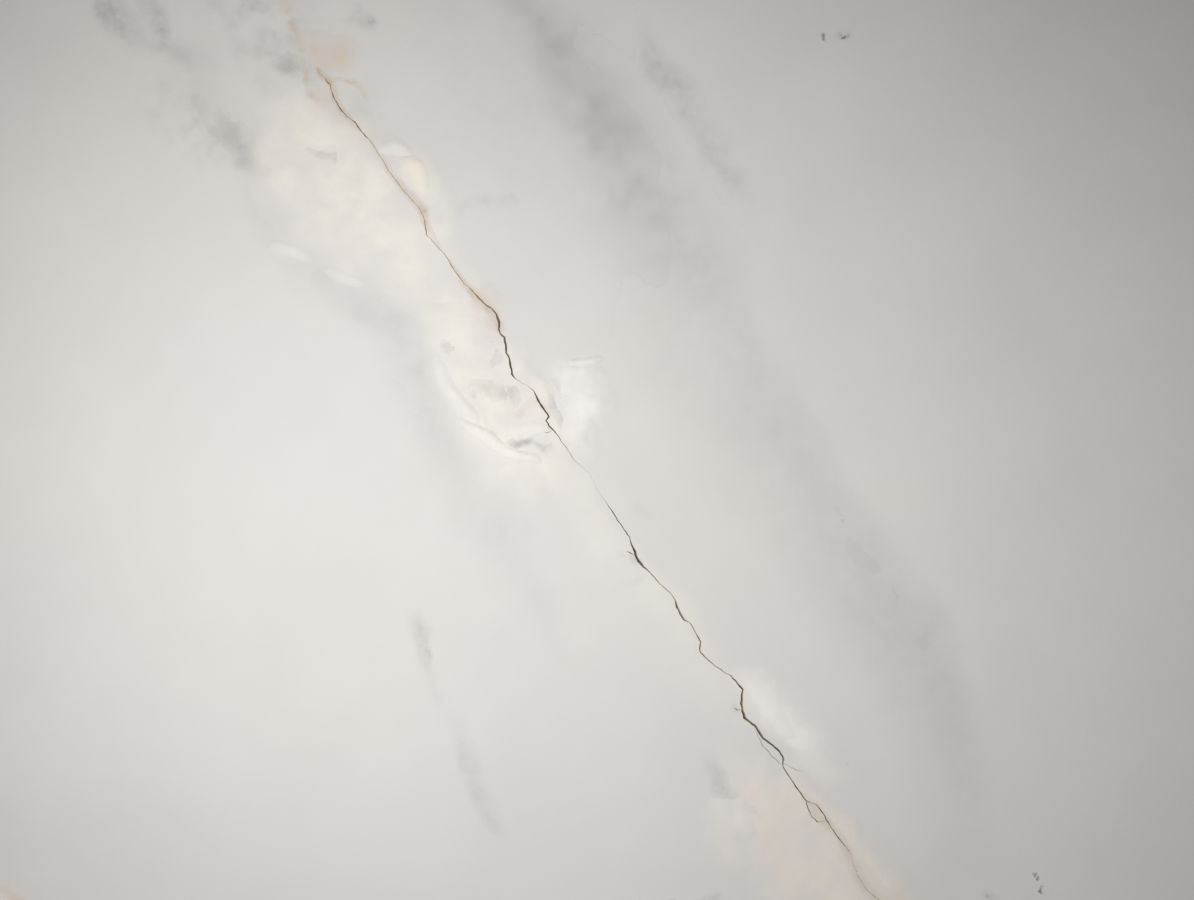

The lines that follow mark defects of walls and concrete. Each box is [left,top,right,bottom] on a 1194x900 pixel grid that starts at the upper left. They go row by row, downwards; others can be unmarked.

damp [77,0,1009,900]
crack [317,70,879,900]